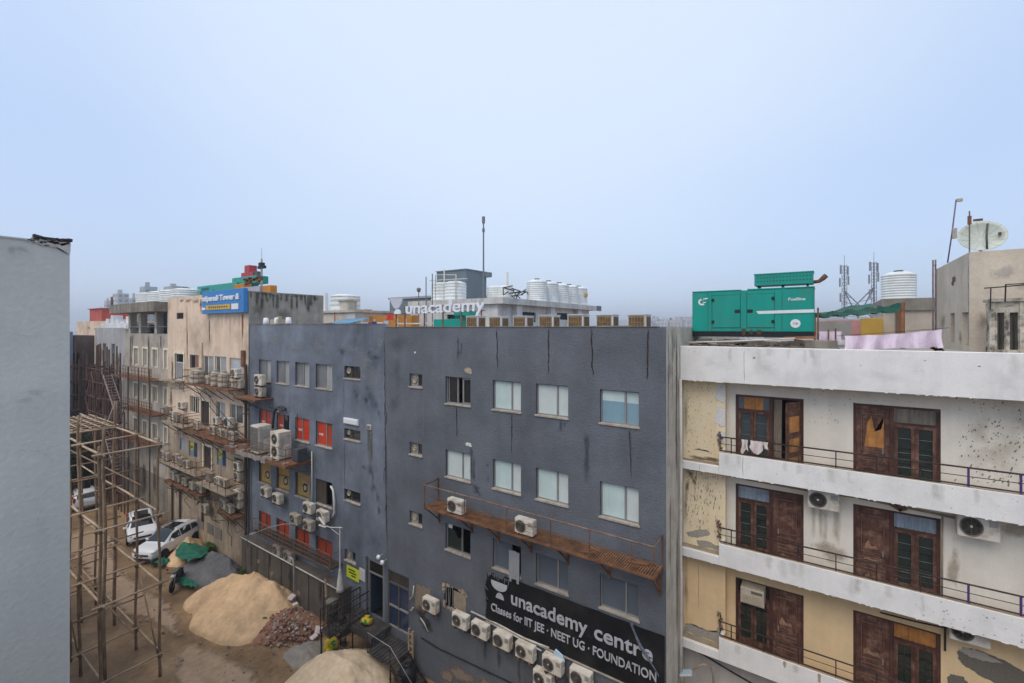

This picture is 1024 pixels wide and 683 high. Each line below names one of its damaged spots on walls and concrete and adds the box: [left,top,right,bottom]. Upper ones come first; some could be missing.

leakage [250,293,316,310]
peeling [684,380,725,454]
peeling [686,469,745,559]
spalling [947,647,1024,683]